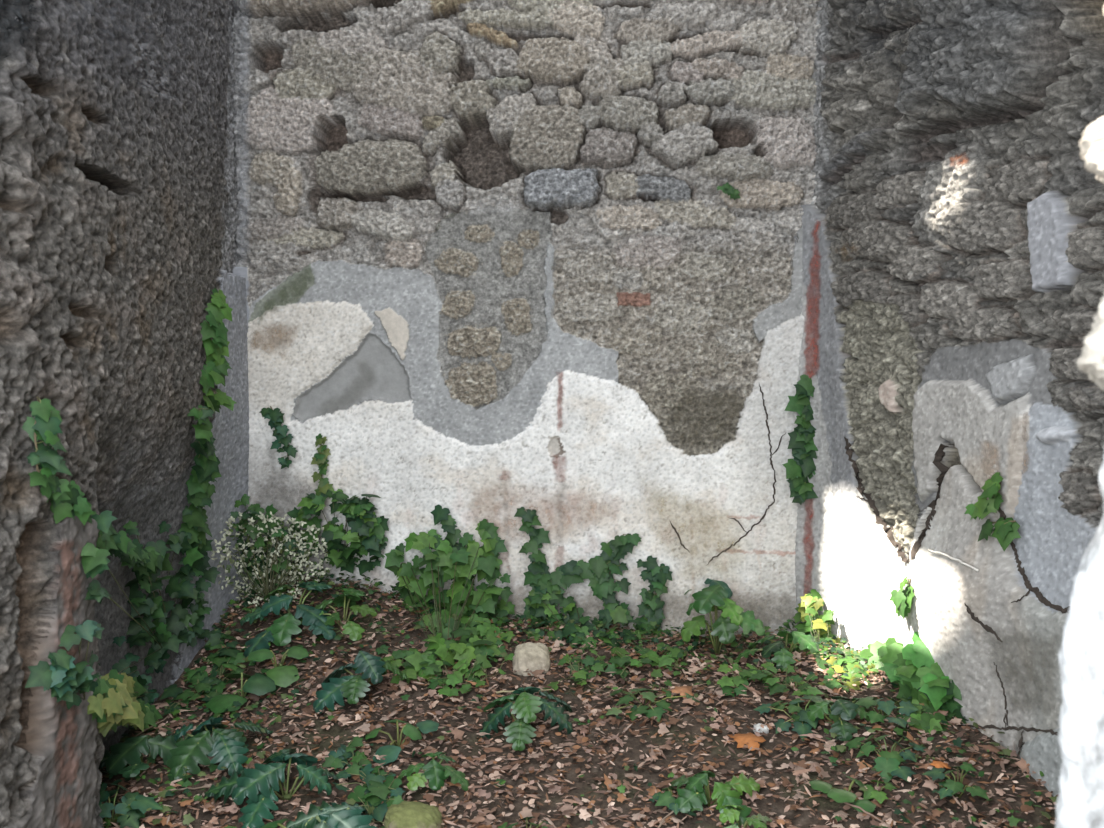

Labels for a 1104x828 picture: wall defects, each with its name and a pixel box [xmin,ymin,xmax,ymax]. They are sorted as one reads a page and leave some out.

water stain [0,0,32,58]
rust [804,221,820,378]
flaking render [247,204,804,637]
crack [670,384,786,565]
rust [803,499,814,594]
spalling [836,299,1037,554]
crack [998,507,1070,614]
crack [961,603,1058,762]